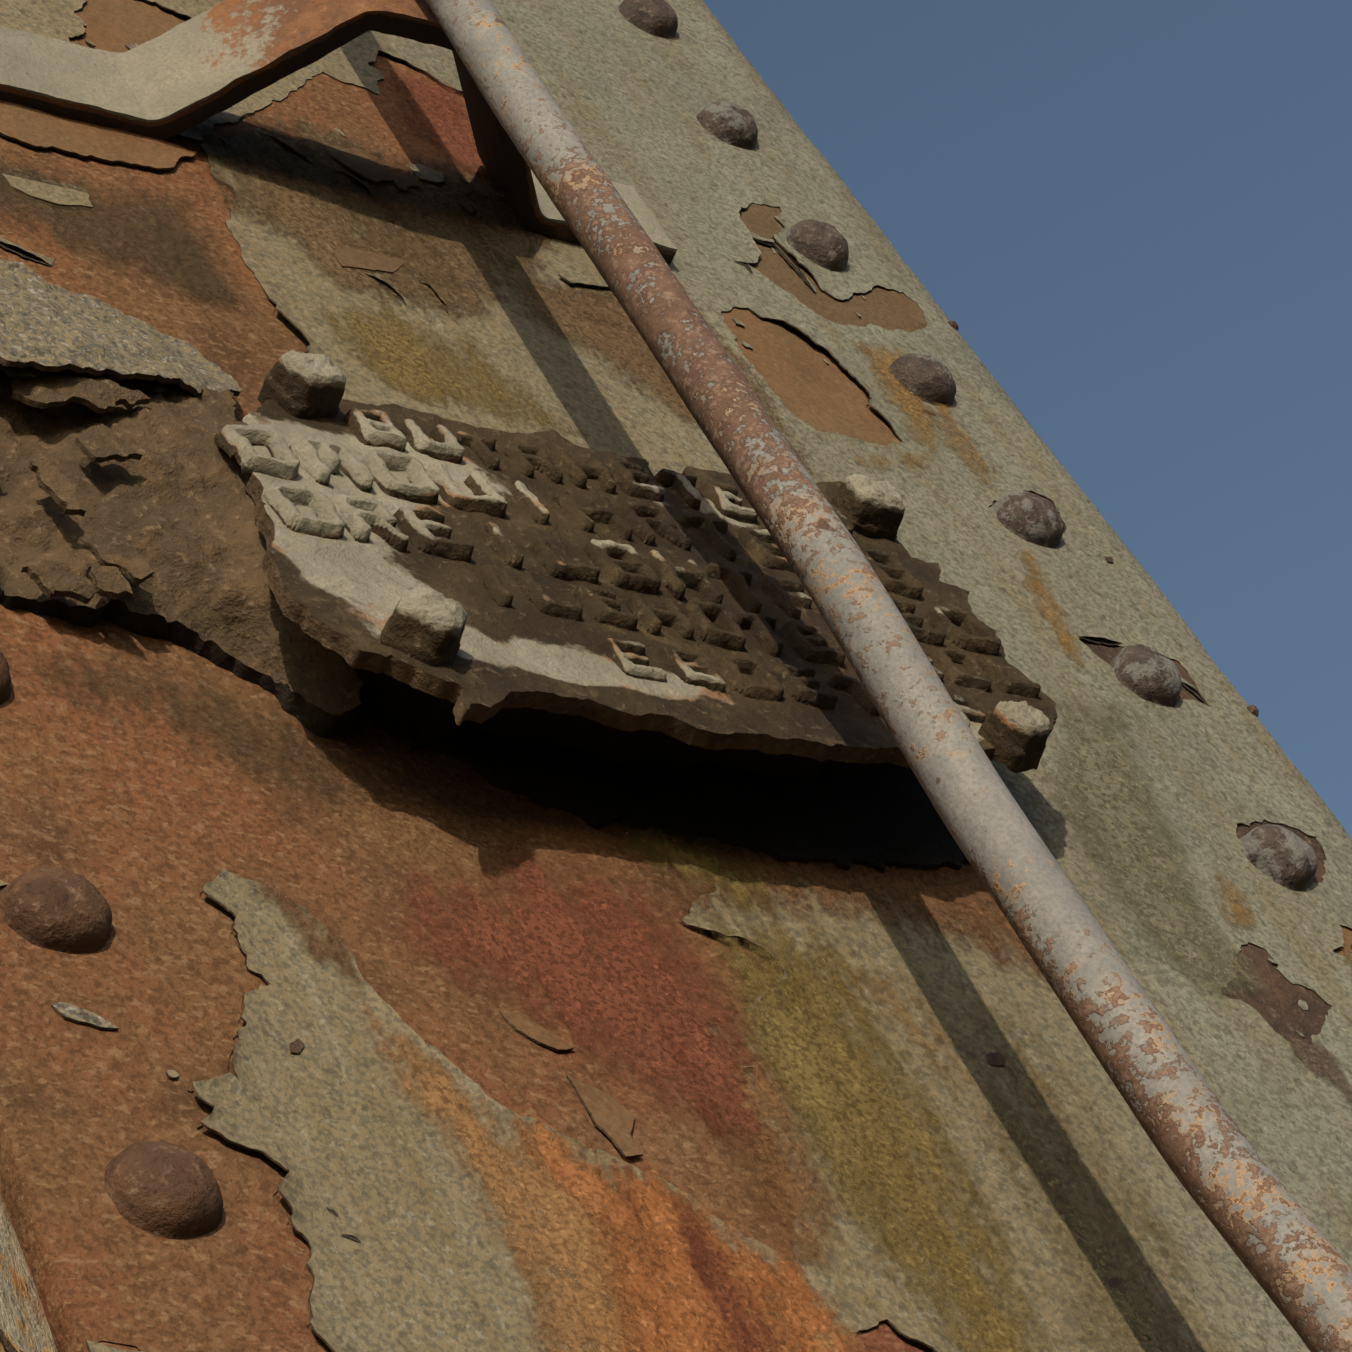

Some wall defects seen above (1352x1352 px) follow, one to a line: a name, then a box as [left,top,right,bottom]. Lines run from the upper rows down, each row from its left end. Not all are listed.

peeling [69,0,185,53]
peeling [0,55,499,422]
peeling [558,274,609,288]
peeling [739,204,927,332]
rust [669,834,1042,978]
peeling [0,603,795,1352]
peeling [1221,944,1331,1043]
rust [367,1009,863,1352]
peeling [844,1323,923,1352]